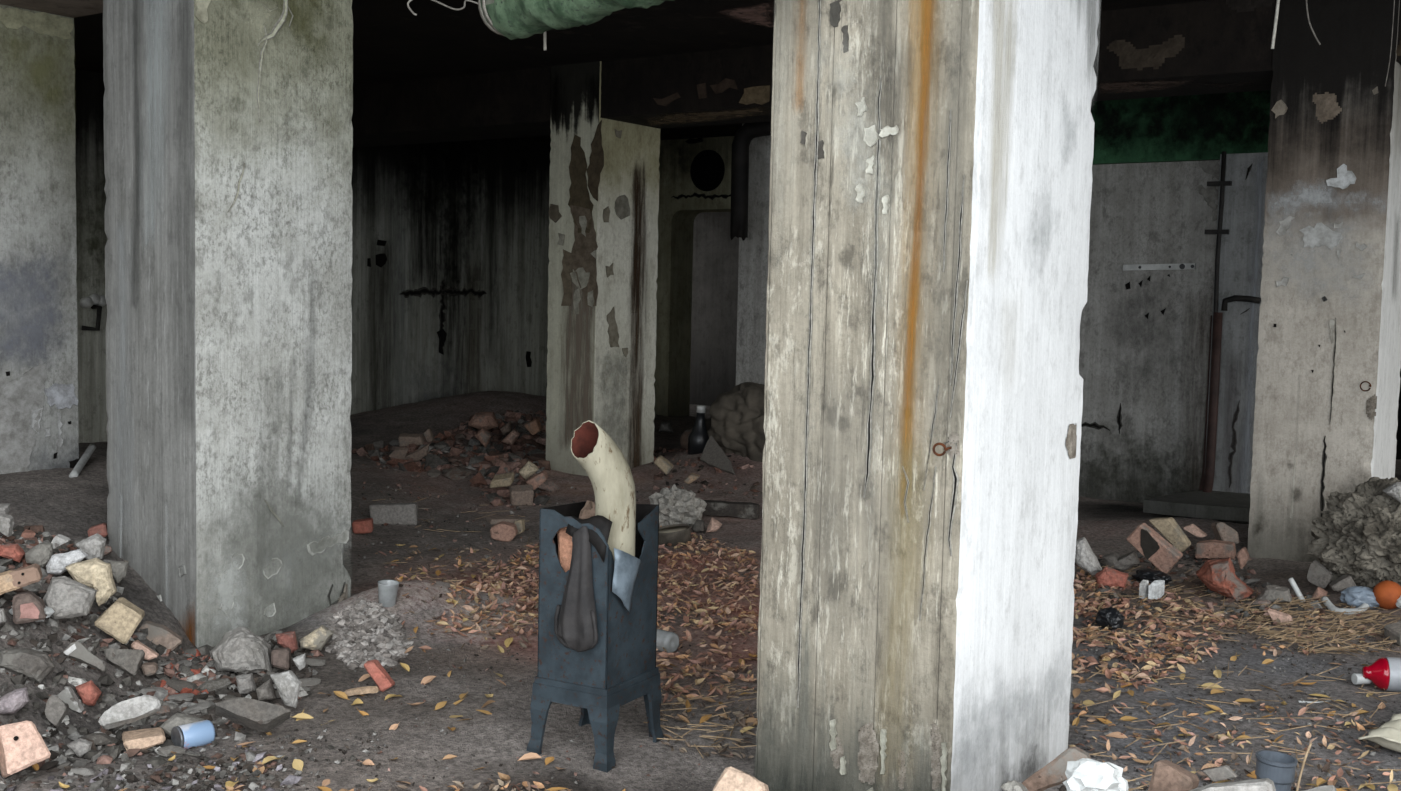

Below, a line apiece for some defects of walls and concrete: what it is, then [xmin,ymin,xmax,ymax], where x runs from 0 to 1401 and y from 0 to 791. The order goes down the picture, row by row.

spalling [1107,35,1185,71]
corrosion [919,0,933,202]
peeling [1271,100,1288,119]
peeling [1312,92,1342,124]
peeling [1326,164,1356,189]
peeling [549,120,630,357]
damp [564,166,646,469]
corrosion [901,234,918,507]
crack [1228,400,1240,488]